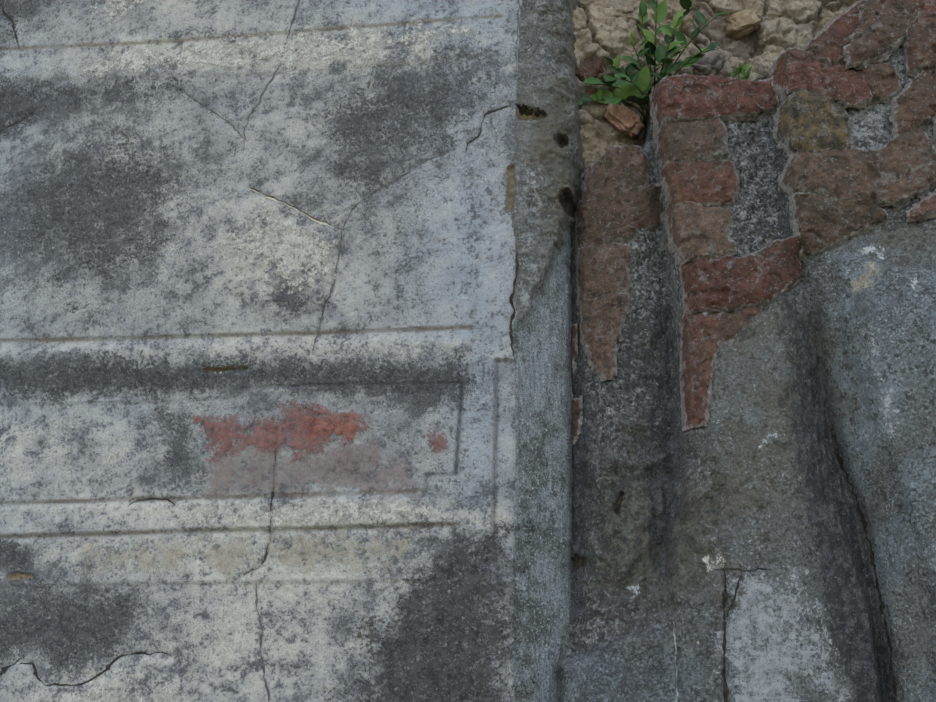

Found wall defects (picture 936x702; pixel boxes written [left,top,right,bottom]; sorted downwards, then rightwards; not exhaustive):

crack [183,0,300,152]
leakage [0,16,505,216]
leakage [0,123,191,313]
crack [250,156,439,353]
crack [0,651,170,686]
leakage [0,346,477,482]
crack [239,448,277,702]
peeling [192,399,419,499]
leakage [184,498,540,702]
peeling [426,428,448,453]
crack [712,567,772,702]
leakage [702,310,887,702]